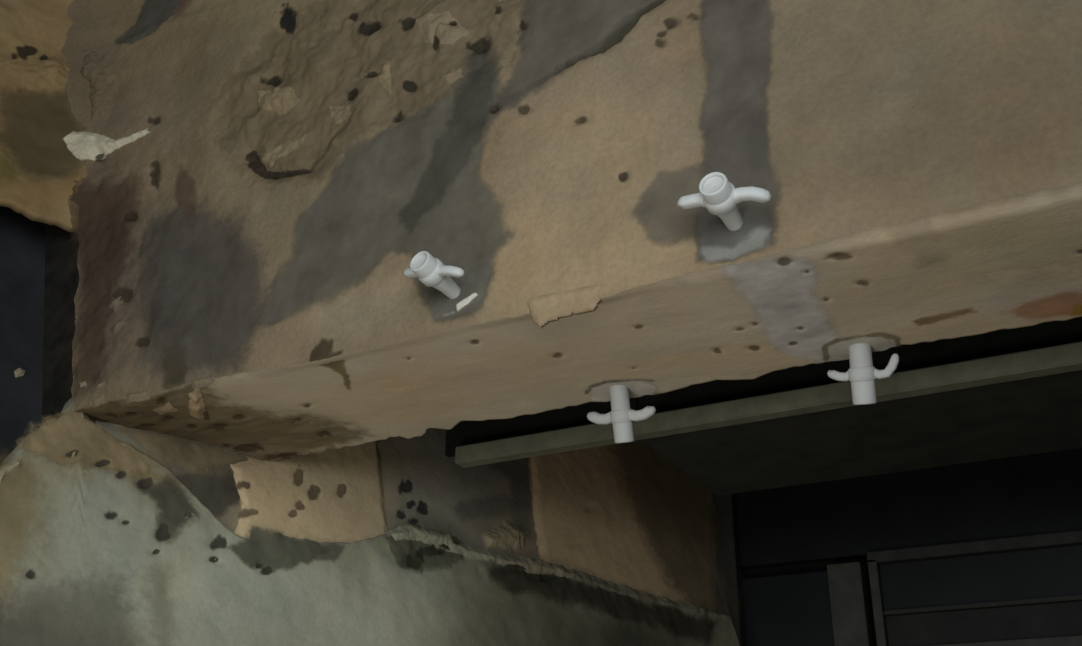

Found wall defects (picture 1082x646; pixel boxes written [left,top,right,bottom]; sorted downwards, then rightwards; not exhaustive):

damp [115,0,186,43]
spalling [349,13,380,35]
spalling [401,6,490,53]
crack [547,0,665,79]
spalling [254,76,308,117]
spalling [365,57,417,105]
flaking render [63,117,160,161]
spalling [261,129,310,170]
damp [635,0,779,259]
damp [146,0,653,385]
flaking render [527,284,601,329]
spalling [385,519,699,615]